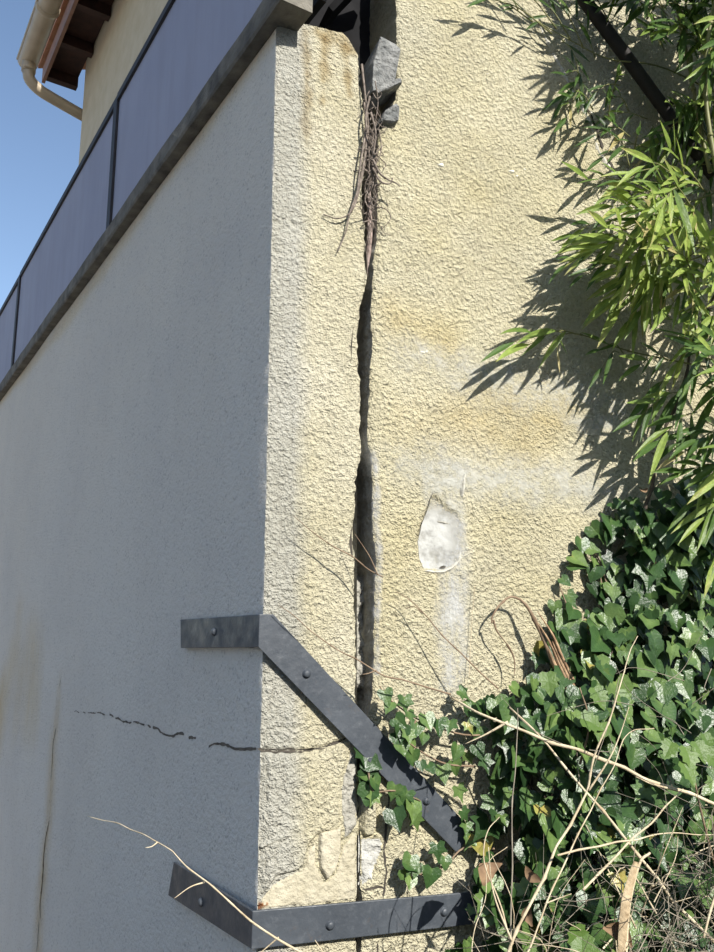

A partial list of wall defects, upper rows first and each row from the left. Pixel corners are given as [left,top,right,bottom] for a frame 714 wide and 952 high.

flaking render [418,470,467,574]
crack [350,528,366,692]
crack [74,711,346,753]
crack [36,823,49,952]
crack [363,781,390,897]